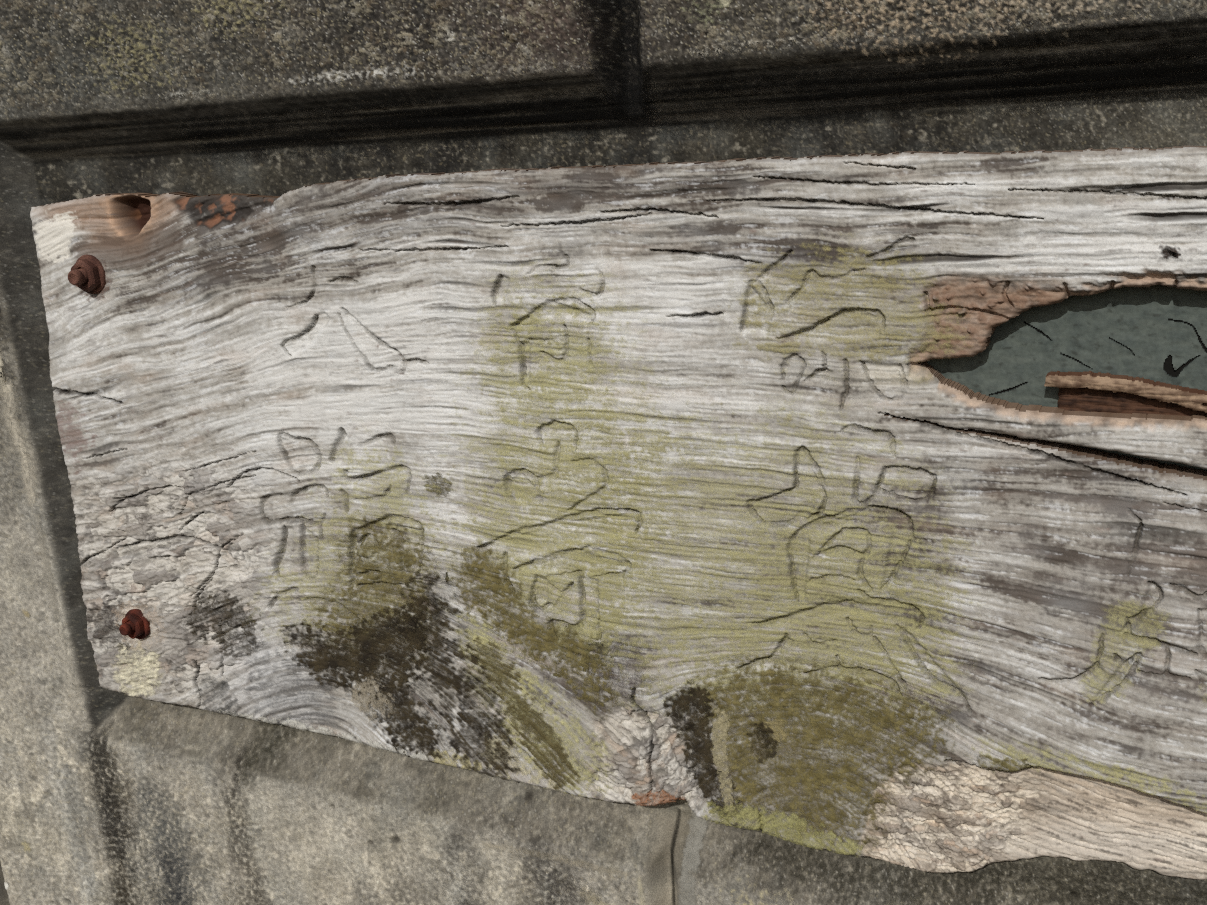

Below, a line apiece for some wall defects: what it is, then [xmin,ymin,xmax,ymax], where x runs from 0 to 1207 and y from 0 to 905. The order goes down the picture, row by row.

leakage [227,723,286,804]